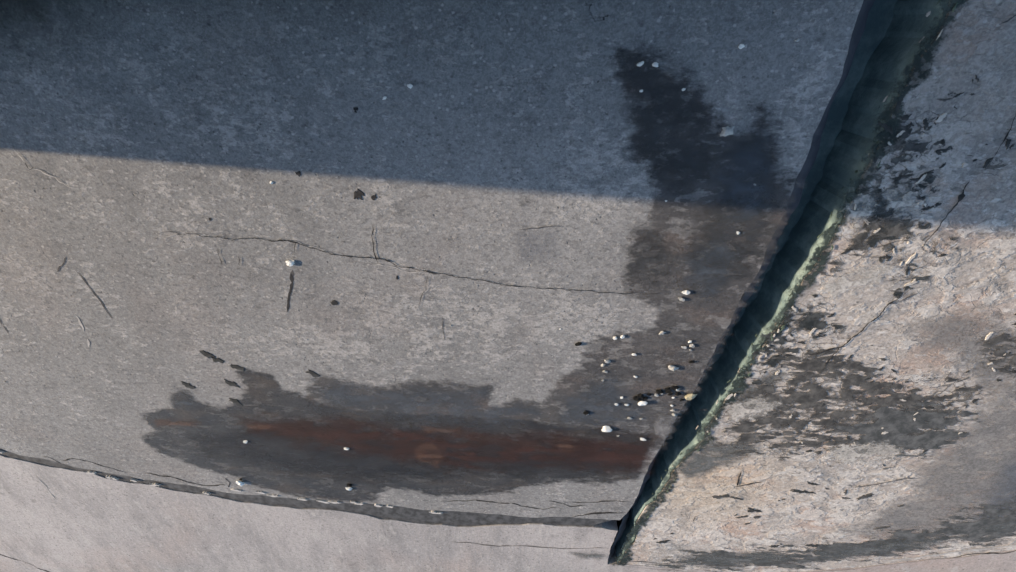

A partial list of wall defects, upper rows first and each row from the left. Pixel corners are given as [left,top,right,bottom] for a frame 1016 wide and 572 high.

peeling [848,162,946,228]
crack [154,229,680,305]
water stain [143,50,805,502]
crack [806,291,918,371]
peeling [726,398,782,420]
peeling [826,444,900,466]
crack [0,448,1016,572]
spalling [712,494,761,525]